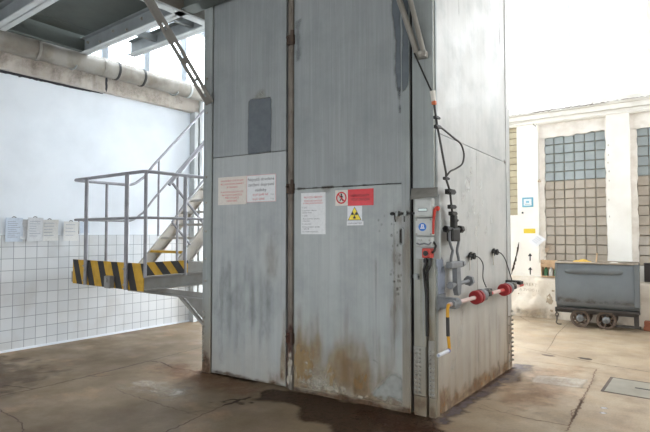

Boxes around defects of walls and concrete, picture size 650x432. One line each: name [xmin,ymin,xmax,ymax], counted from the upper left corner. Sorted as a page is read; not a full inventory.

corrosion [281,325,383,408]
damp [238,364,533,432]
crack [468,323,647,431]